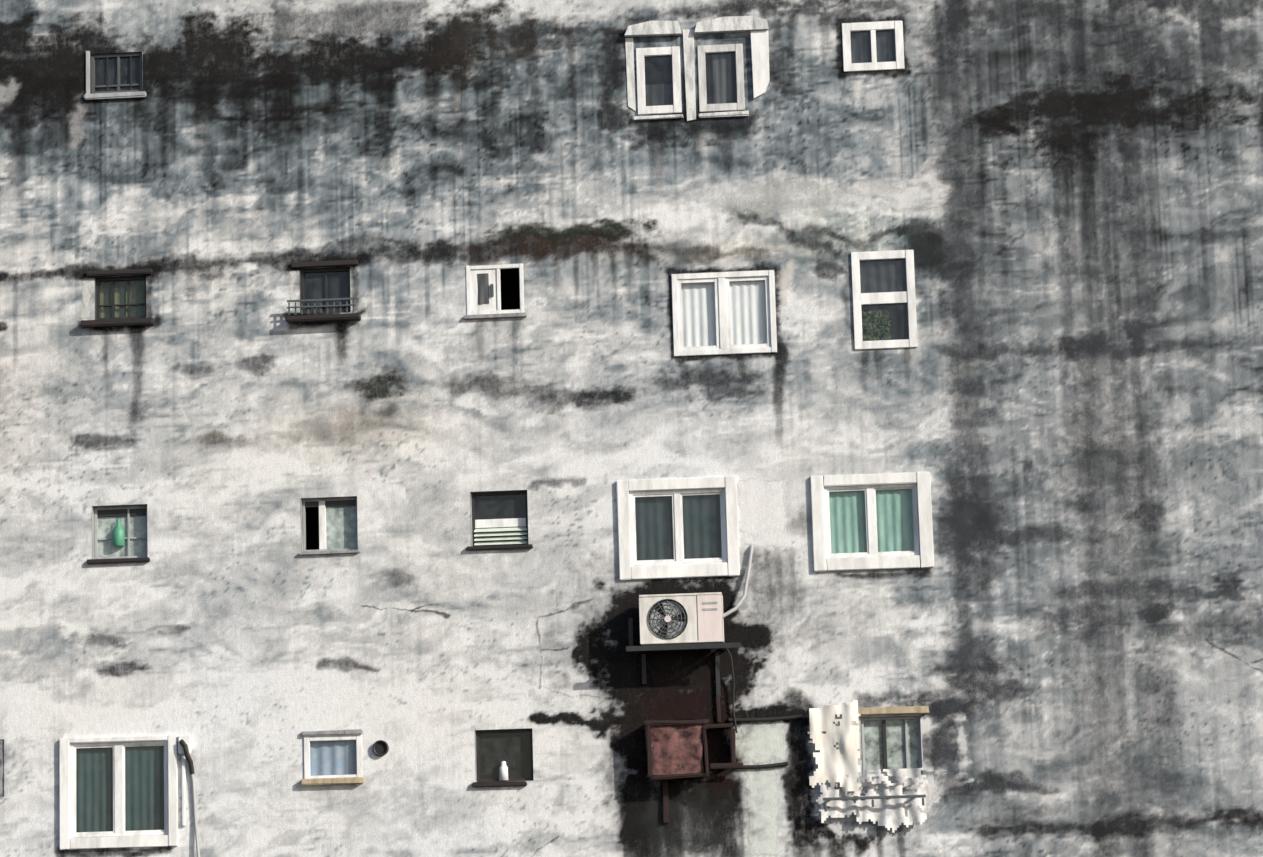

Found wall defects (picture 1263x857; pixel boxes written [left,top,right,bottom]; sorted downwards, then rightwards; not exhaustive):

leakage [0,0,755,149]
leakage [0,265,101,281]
leakage [128,237,455,278]
leakage [738,0,1263,591]
leakage [1077,587,1196,627]
leakage [902,638,1035,800]
flaking render [917,713,974,815]
flaking render [812,788,843,837]
leakage [978,808,1263,842]